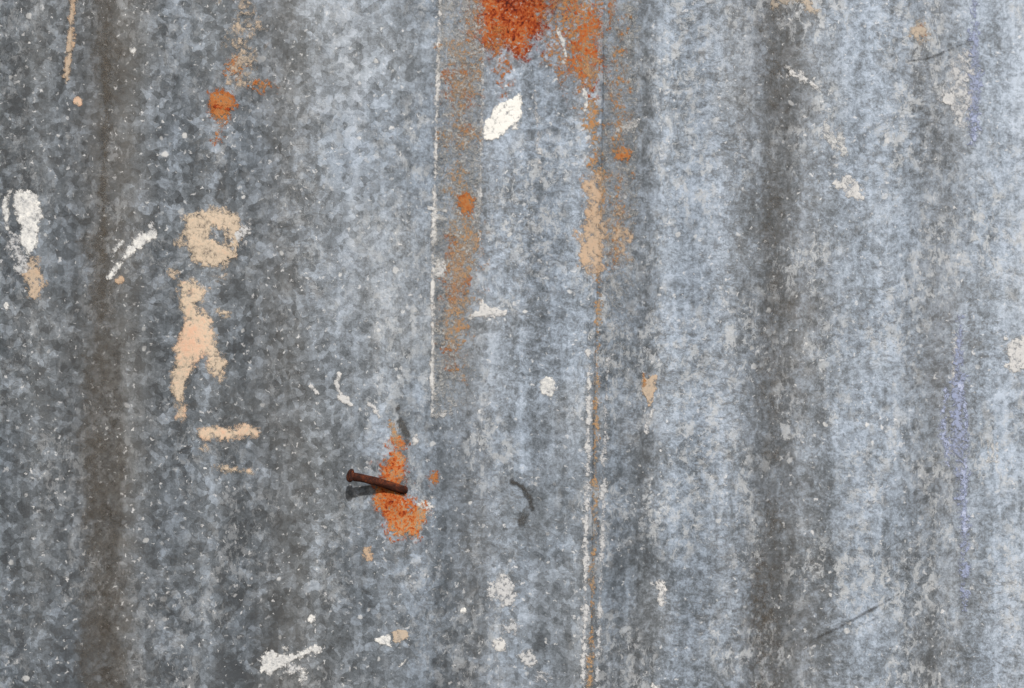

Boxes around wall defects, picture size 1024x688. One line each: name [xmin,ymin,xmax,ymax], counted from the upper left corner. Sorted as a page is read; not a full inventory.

rust [207,0,278,146]
rust [434,0,634,688]
rust [371,406,439,542]